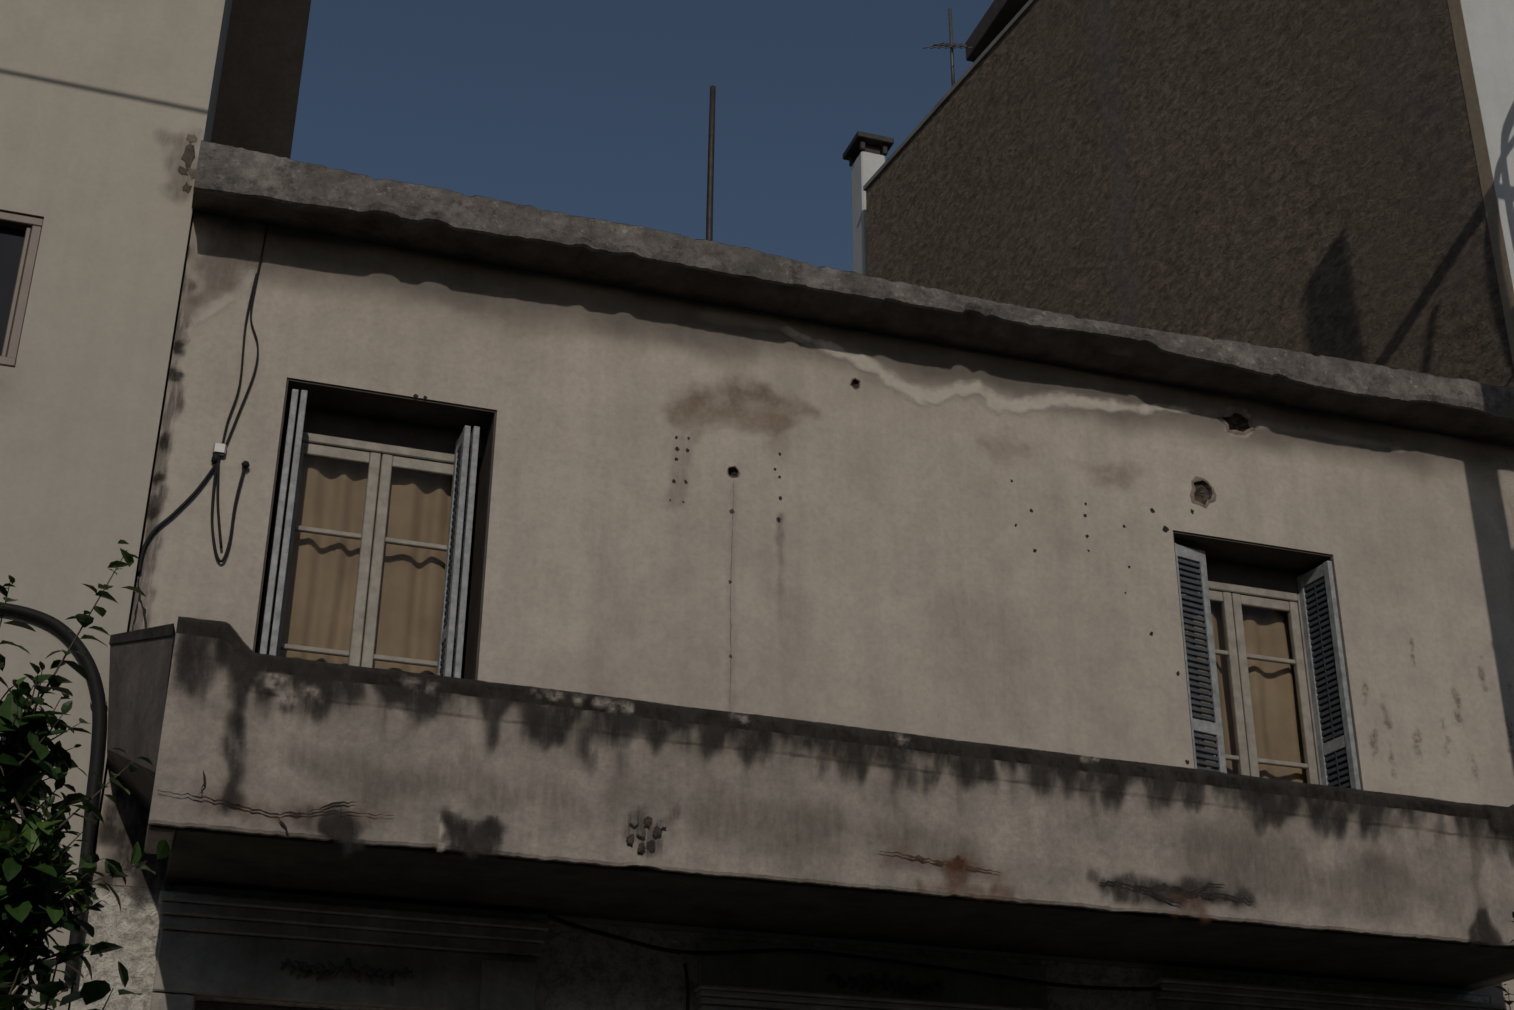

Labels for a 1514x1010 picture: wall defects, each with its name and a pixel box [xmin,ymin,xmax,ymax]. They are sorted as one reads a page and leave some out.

water stain [181,219,251,304]
water stain [271,235,1508,465]
water stain [146,341,183,555]
spalling [1219,408,1254,435]
spalling [1190,476,1217,508]
water stain [174,618,1514,856]
crack [158,771,394,836]
spalling [626,811,667,852]